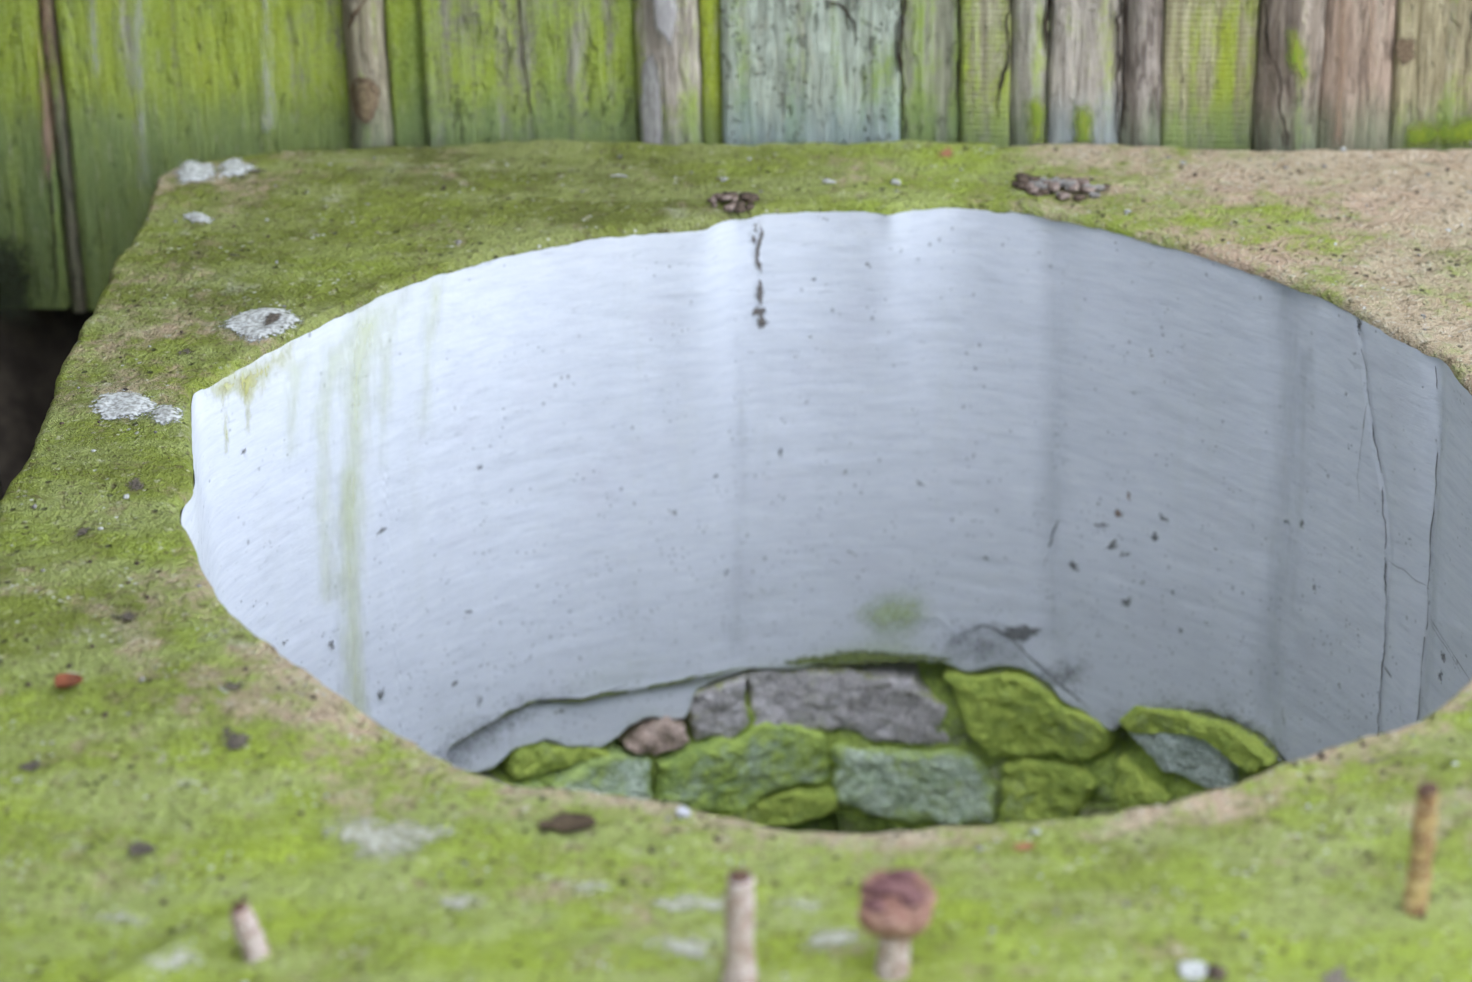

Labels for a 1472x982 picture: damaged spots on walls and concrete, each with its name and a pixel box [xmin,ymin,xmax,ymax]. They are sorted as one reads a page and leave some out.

crack [1356,317,1470,764]